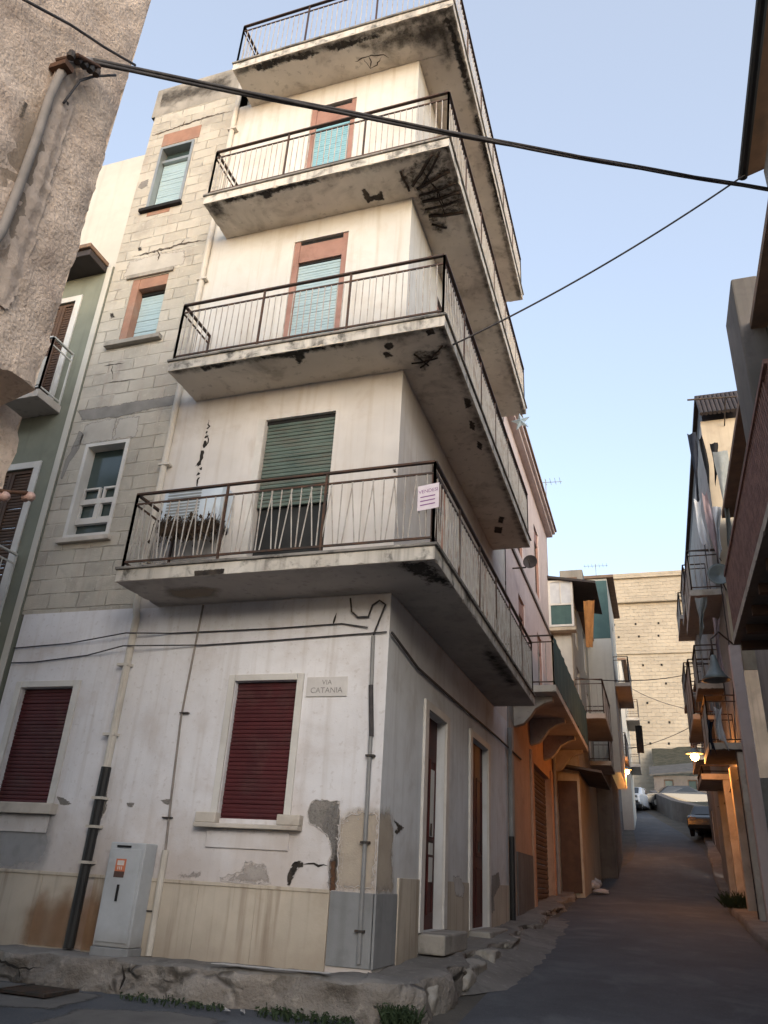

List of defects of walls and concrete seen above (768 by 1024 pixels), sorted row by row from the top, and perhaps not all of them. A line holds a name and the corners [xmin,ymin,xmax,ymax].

crack [355,54,387,69]
damp [237,10,509,254]
damp [208,171,349,216]
spalling [362,189,384,203]
spalling [399,150,464,232]
crack [139,240,205,261]
spalling [411,345,448,370]
crack [196,422,210,486]
flaking render [307,799,404,892]
peeling [219,861,270,885]
crack [286,861,327,885]